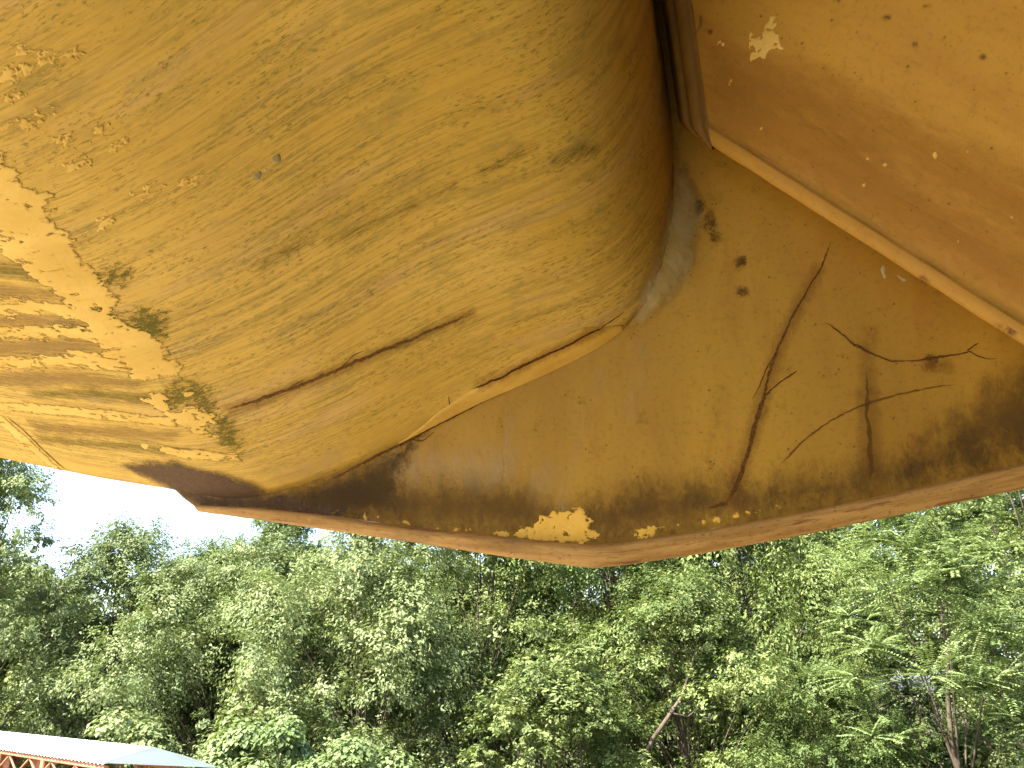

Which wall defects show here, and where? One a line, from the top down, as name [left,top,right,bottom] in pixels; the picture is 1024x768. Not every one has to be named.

peeling [749,16,784,62]
damp [0,315,100,357]
damp [0,369,152,404]
peeling [0,151,220,470]
crack [235,314,470,408]
crack [334,312,624,478]
crack [709,248,829,508]
crack [787,323,989,458]
damp [29,421,553,530]
peeling [485,507,600,544]
peeling [633,522,685,539]
damp [586,463,933,534]